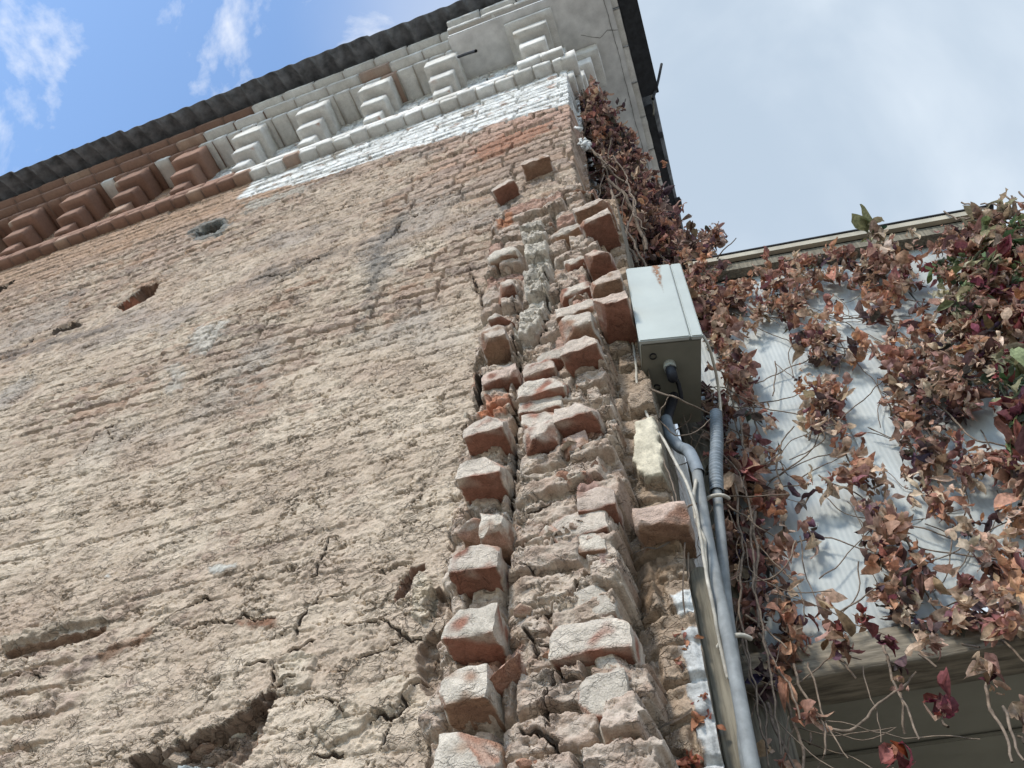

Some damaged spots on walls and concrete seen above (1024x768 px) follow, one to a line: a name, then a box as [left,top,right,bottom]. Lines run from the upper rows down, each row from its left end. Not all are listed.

flaking render [496,212,513,229]
spalling [114,283,159,311]
flaking render [473,373,514,419]
crack [158,541,347,689]
peeling [672,589,694,615]
spalling [4,626,107,661]
crack [337,615,423,673]
spalling [414,586,452,696]
spalling [128,690,278,768]
crack [370,683,420,751]
crack [311,751,344,759]